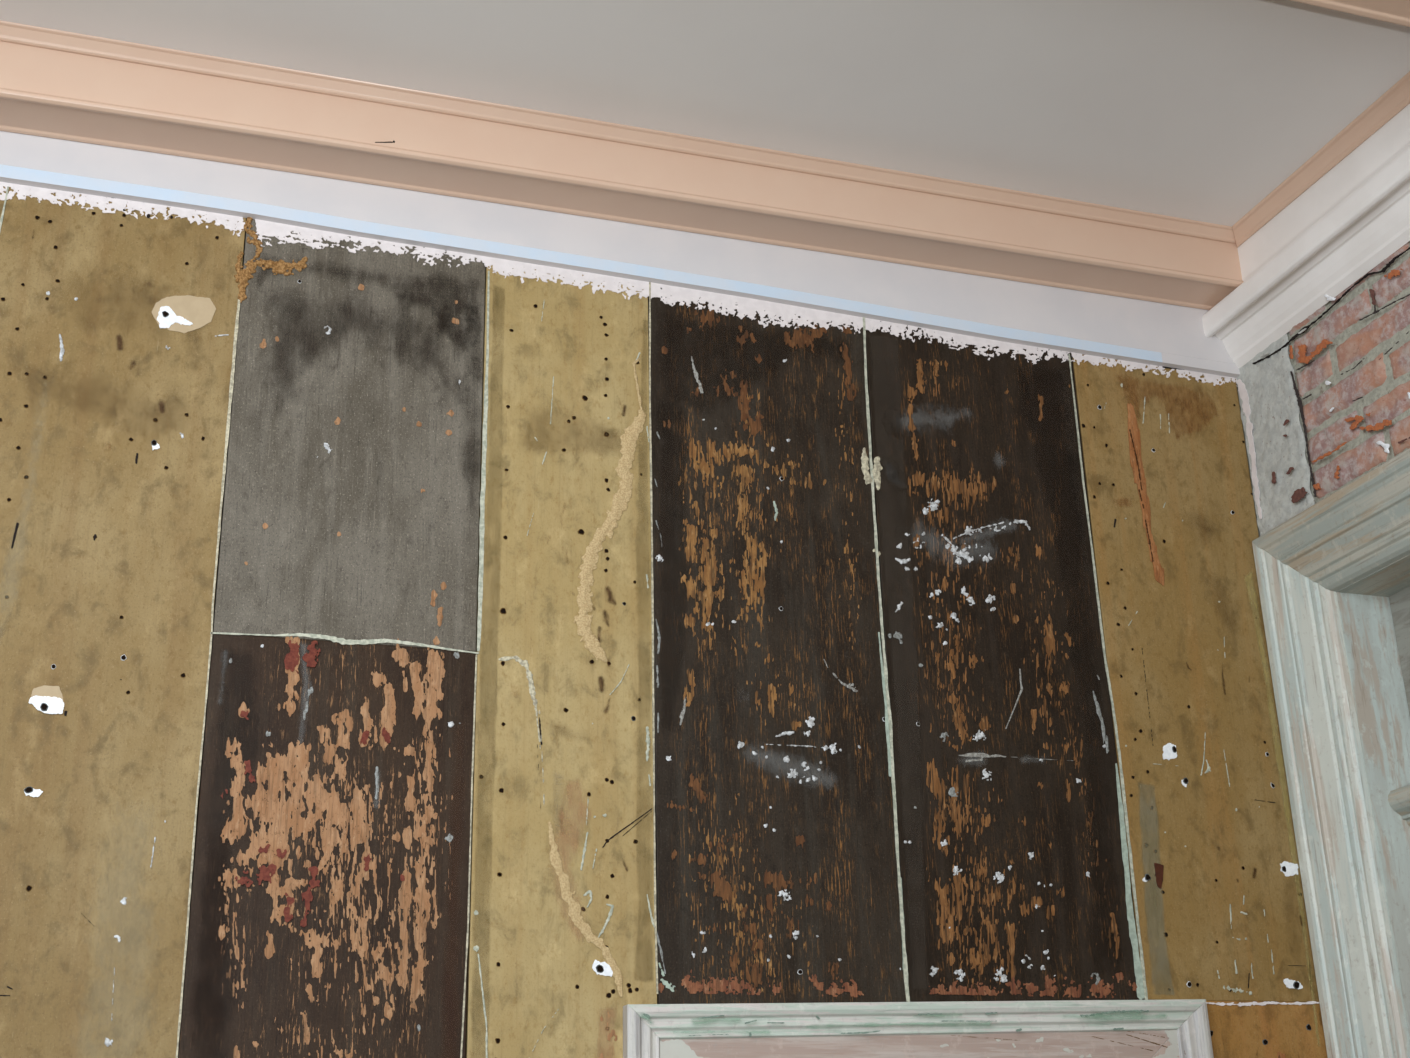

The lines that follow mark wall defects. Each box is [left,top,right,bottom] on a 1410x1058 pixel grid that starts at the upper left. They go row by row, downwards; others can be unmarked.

peeling [687,309,762,364]
peeling [678,320,862,731]
spalling [1127,403,1164,586]
crack [1252,247,1410,497]
peeling [907,359,1137,998]
peeling [216,582,453,1058]
peeling [667,773,864,997]